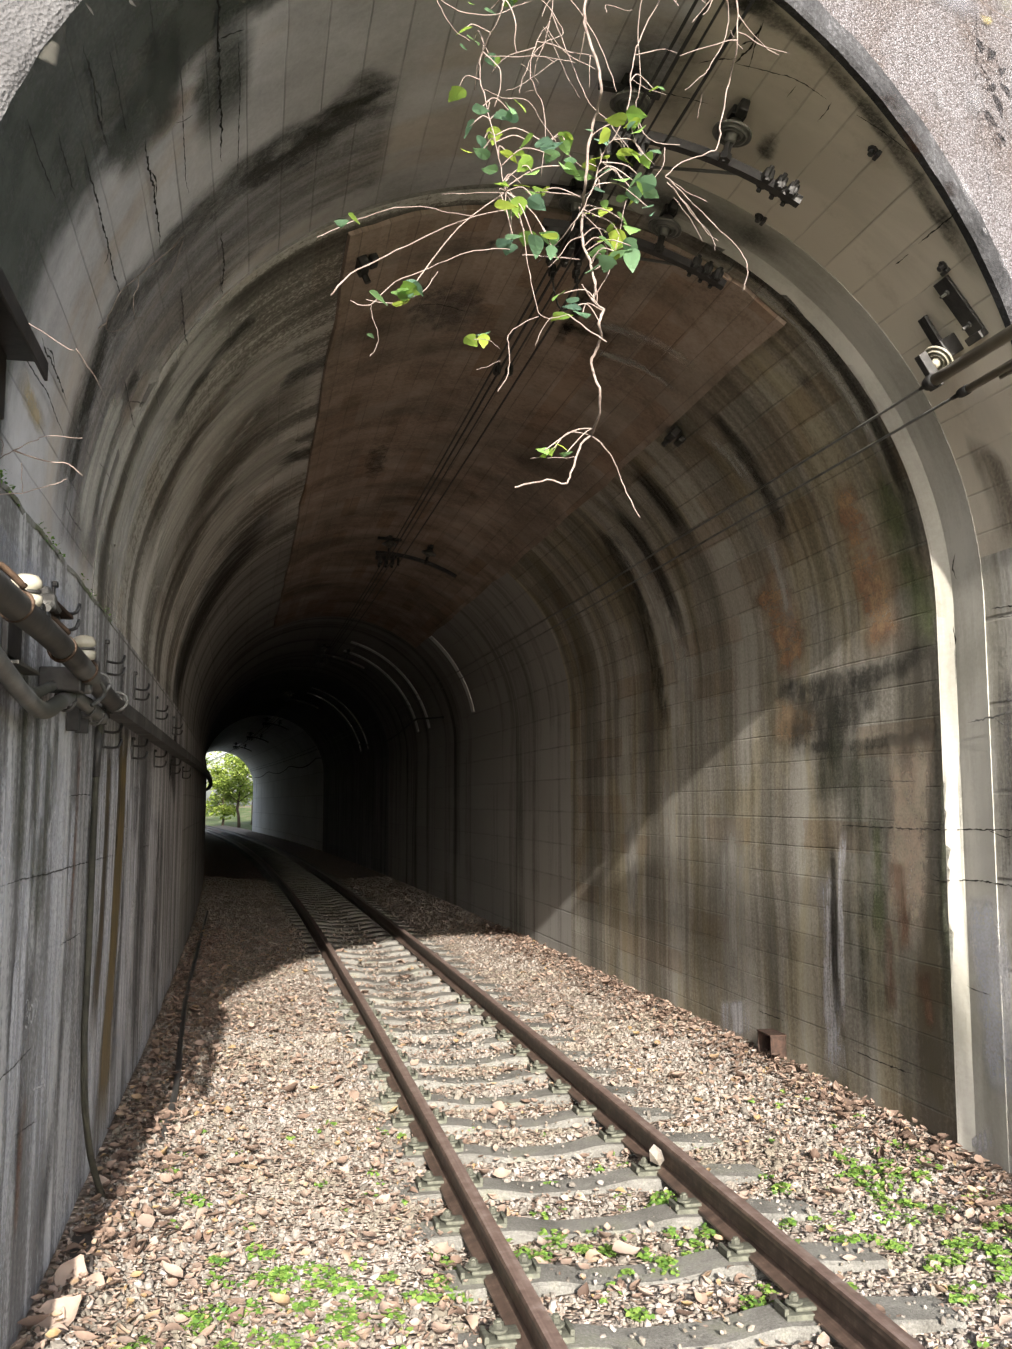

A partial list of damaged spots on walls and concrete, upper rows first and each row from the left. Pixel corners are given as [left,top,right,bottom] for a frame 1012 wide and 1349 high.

crack [27,0,245,294]
water stain [110,27,179,168]
water stain [197,38,246,121]
crack [701,20,912,153]
water stain [64,74,388,605]
water stain [153,356,326,700]
water stain [0,719,171,1242]
corrosion [93,745,129,1103]
water stain [785,649,931,790]
water stain [941,786,950,924]